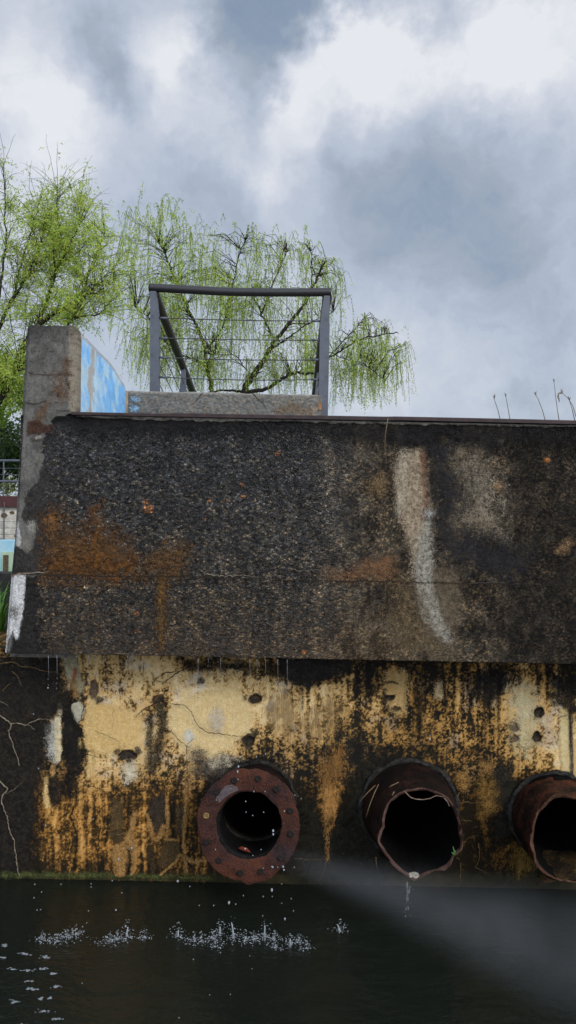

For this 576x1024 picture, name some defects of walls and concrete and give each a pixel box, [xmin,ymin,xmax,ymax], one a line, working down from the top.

crack [0,656,295,877]
water stain [0,416,576,887]